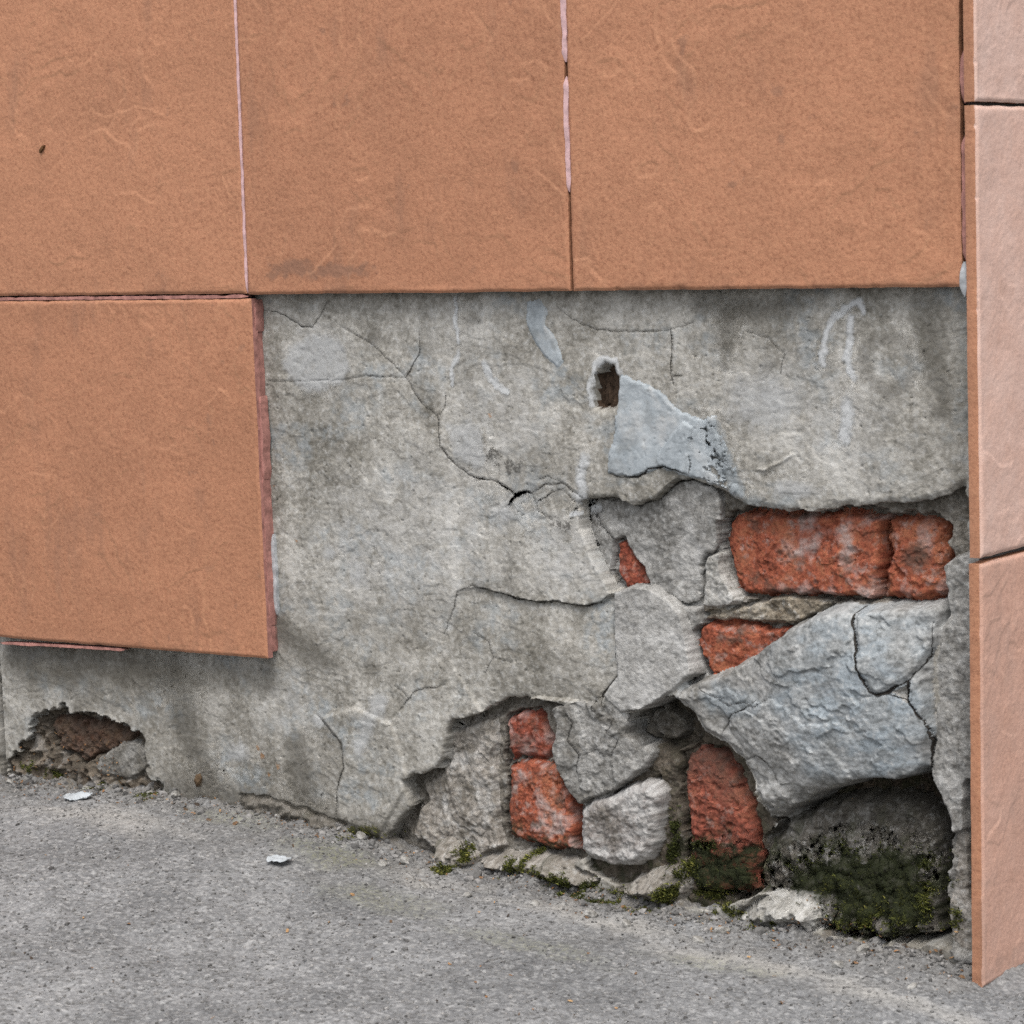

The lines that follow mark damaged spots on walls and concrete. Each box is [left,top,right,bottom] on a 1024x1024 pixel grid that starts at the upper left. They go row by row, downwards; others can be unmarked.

peeling [526,299,563,368]
crack [564,312,693,385]
crack [273,327,690,542]
crack [444,585,613,633]
spalling [9,707,164,791]
crack [562,653,617,768]
spalling [398,374,979,963]
crack [698,687,766,733]
crack [851,605,937,768]